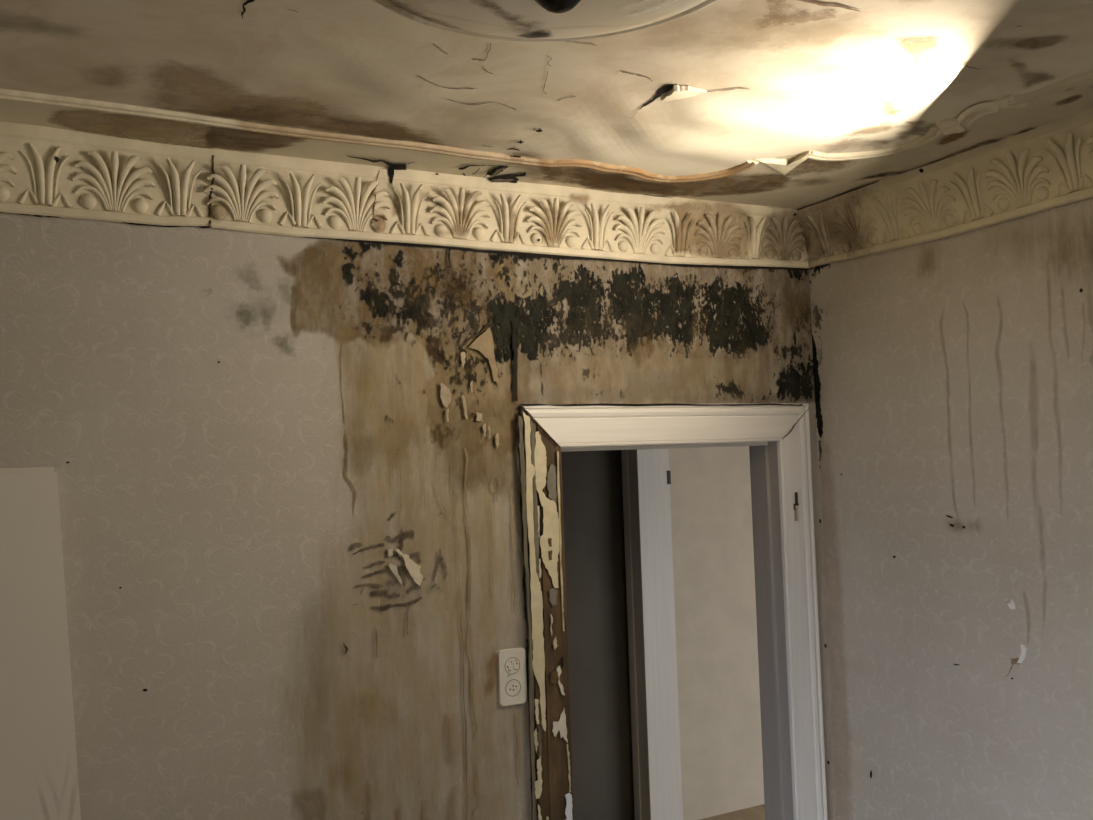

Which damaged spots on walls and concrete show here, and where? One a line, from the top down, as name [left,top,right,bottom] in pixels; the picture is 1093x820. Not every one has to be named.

crack [241,0,255,19]
damp [53,67,439,151]
crack [418,43,516,110]
crack [543,41,594,101]
crack [622,72,748,119]
damp [902,38,937,57]
crack [347,155,413,230]
damp [122,222,227,230]
damp [279,128,1036,820]
flaking render [388,548,423,587]
peeling [518,411,573,820]